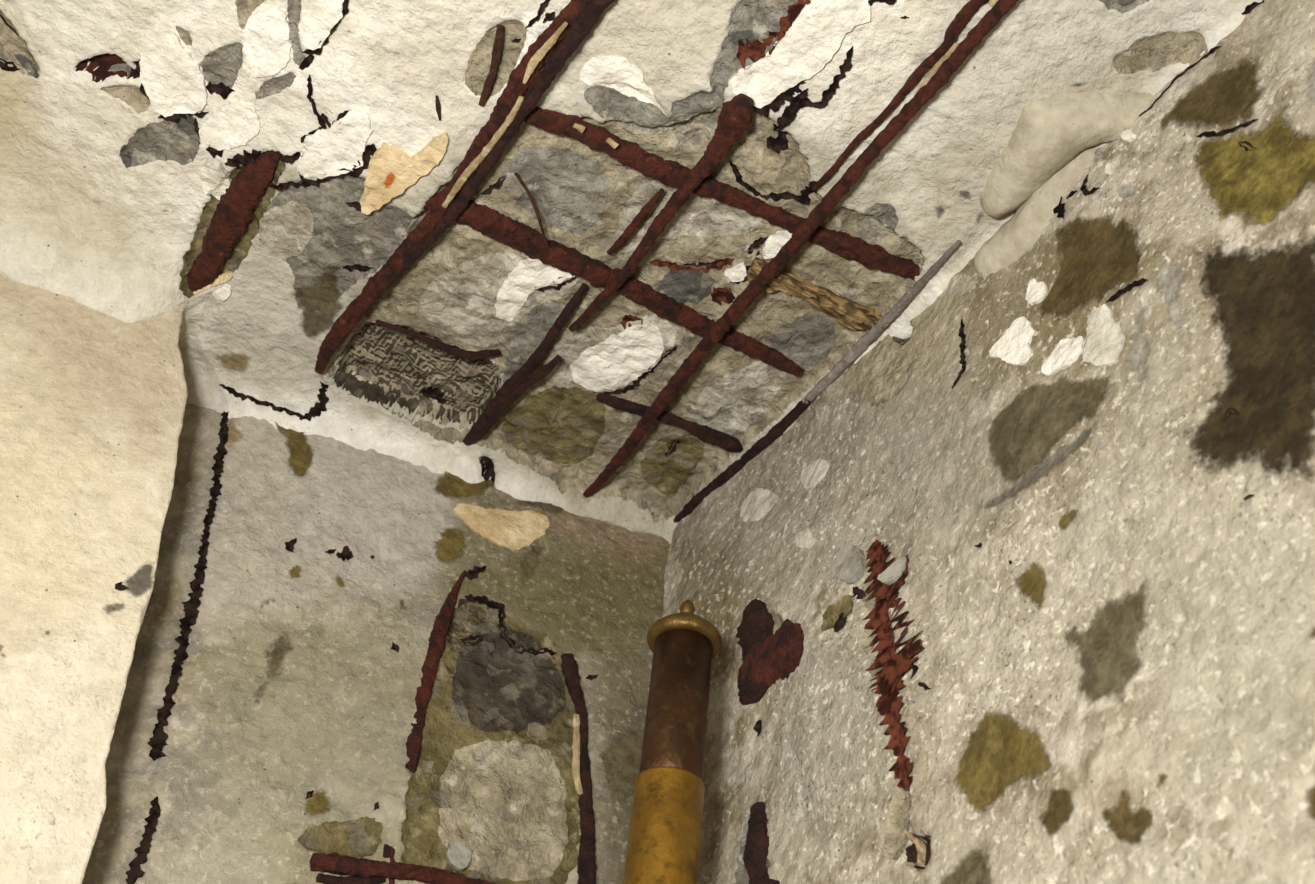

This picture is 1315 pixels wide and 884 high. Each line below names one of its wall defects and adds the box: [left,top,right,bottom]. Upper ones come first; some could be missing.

crack [131,0,377,214]
water stain [1161,61,1315,224]
spalling [100,0,925,524]
corrosion [315,0,1018,523]
water stain [1187,241,1315,476]
crack [126,797,160,884]
crack [147,382,329,761]
spalling [401,596,581,884]
peeling [453,503,550,552]
corrosion [561,653,597,884]
corrosion [735,599,804,705]
water stain [956,713,1051,811]